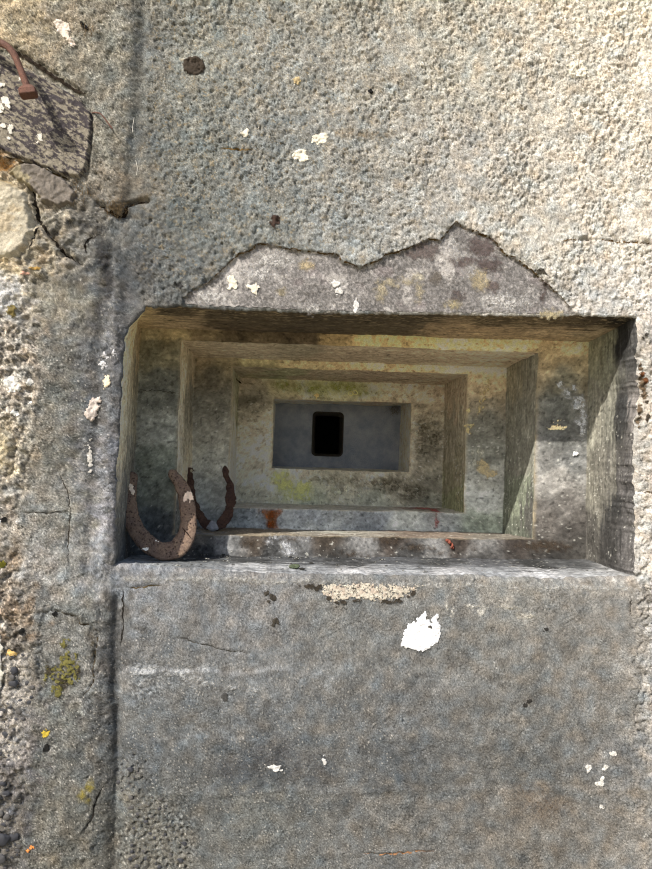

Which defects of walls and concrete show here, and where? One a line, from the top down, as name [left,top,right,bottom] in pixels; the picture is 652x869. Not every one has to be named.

crack [29,191,98,265]
crack [99,202,149,218]
crack [564,237,649,245]
spalling [183,221,575,319]
crack [84,786,104,832]